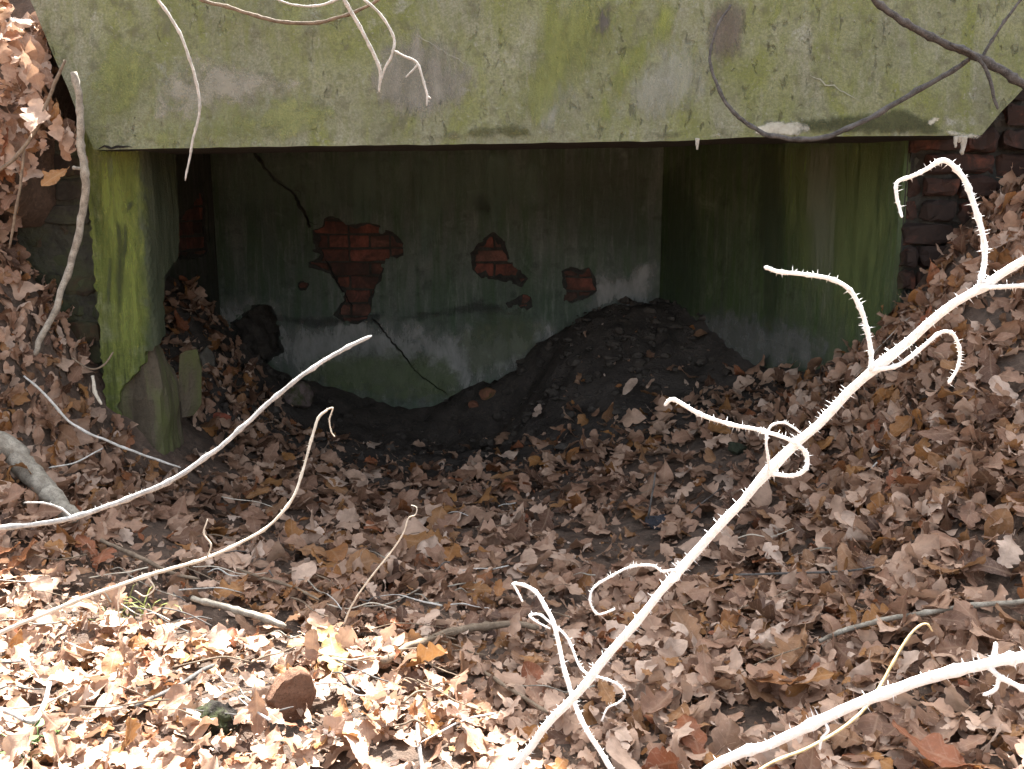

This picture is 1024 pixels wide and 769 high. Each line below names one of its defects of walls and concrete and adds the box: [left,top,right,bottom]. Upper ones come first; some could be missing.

crack [253,153,317,228]
leakage [97,150,144,352]
flaking render [295,216,404,326]
flaking render [470,232,533,312]
flaking render [559,267,597,304]
leakage [596,264,653,307]
crack [325,260,450,397]
leakage [273,320,553,399]